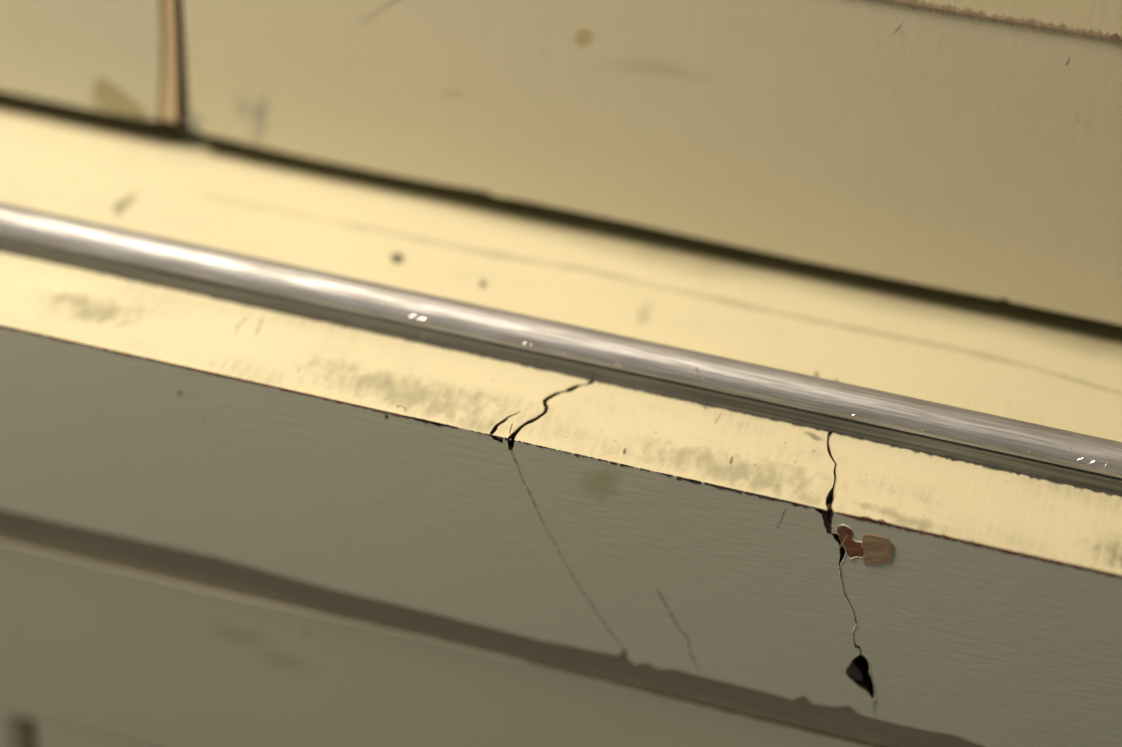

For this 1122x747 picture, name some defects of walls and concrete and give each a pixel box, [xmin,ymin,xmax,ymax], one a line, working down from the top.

crack [490,380,595,450]
crack [815,432,861,654]
peeling [836,516,894,565]